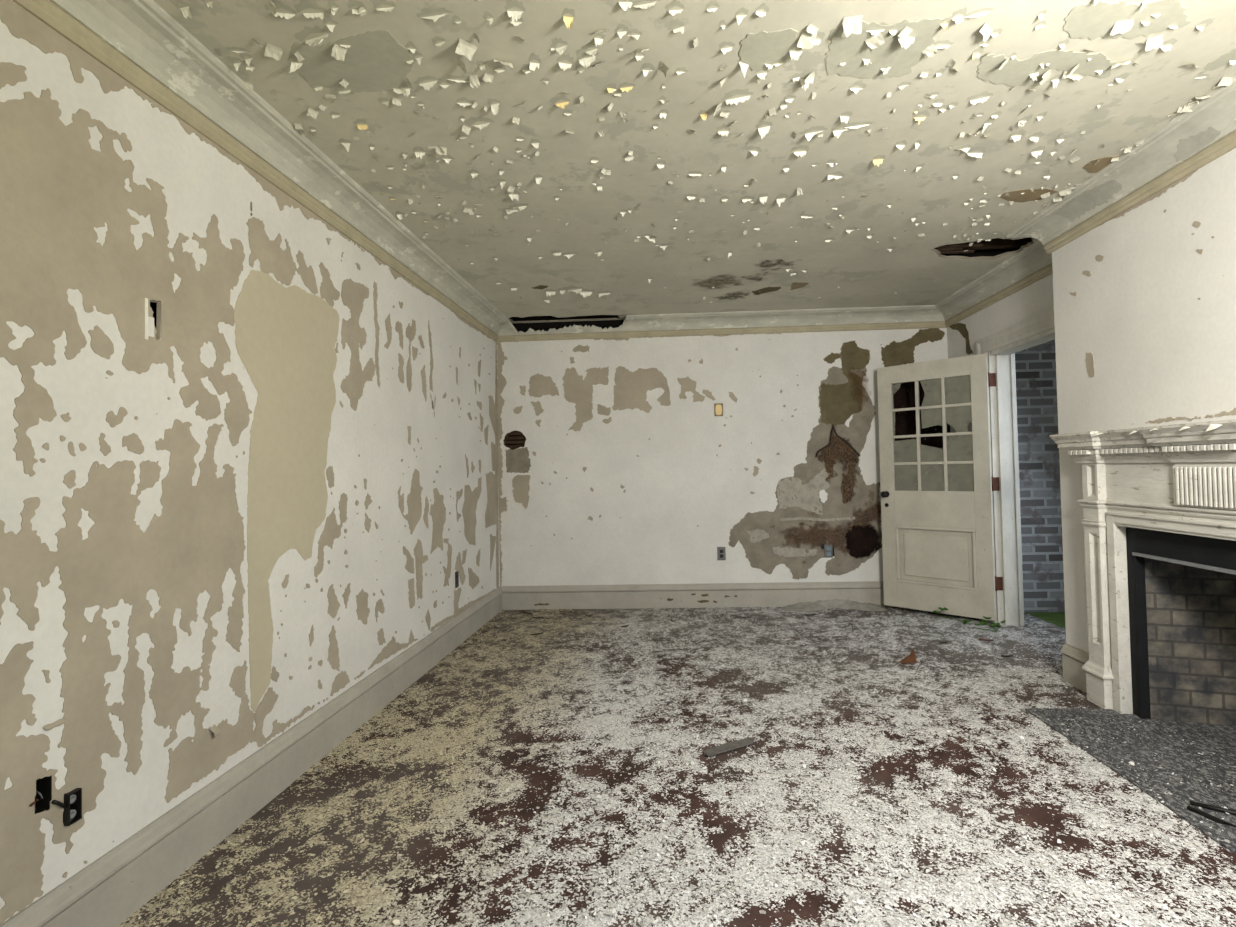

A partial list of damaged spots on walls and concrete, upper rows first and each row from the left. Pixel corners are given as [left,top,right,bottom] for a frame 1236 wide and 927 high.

peeling [615,156,803,258]
spalling [752,268,808,300]
peeling [688,0,1215,257]
peeling [1168,48,1236,121]
peeling [0,0,738,925]
spalling [728,323,973,580]